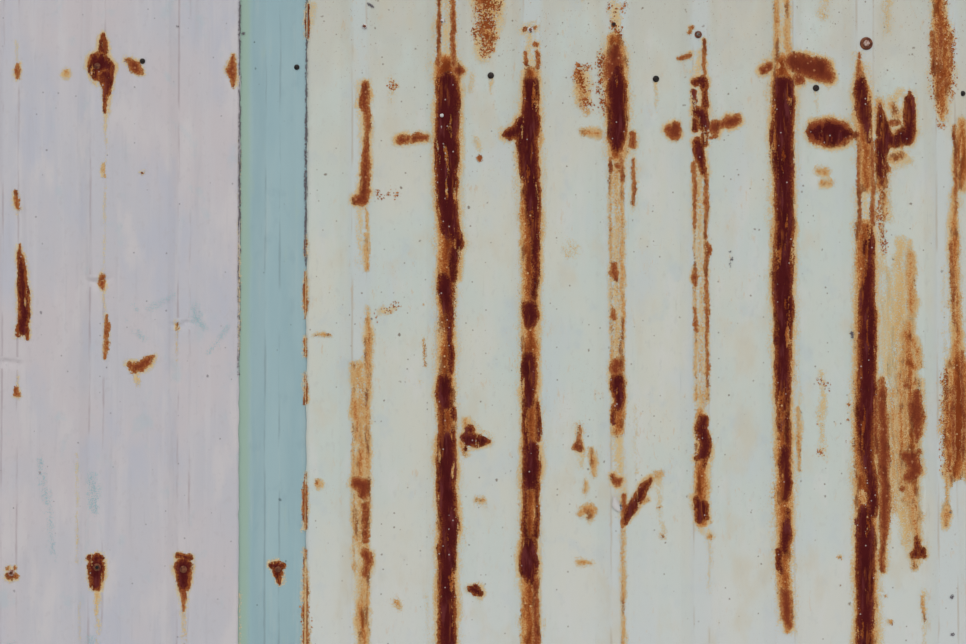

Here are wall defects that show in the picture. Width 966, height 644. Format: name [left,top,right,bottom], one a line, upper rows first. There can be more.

corrosion [10,188,23,215]
corrosion [13,241,34,341]
corrosion [75,453,109,644]
corrosion [60,30,146,362]
corrosion [123,353,158,387]
corrosion [169,551,197,644]
corrosion [347,75,400,272]
corrosion [345,301,402,644]
corrosion [390,0,549,644]
corrosion [569,0,667,644]
corrosion [660,24,746,594]
corrosion [754,0,966,644]